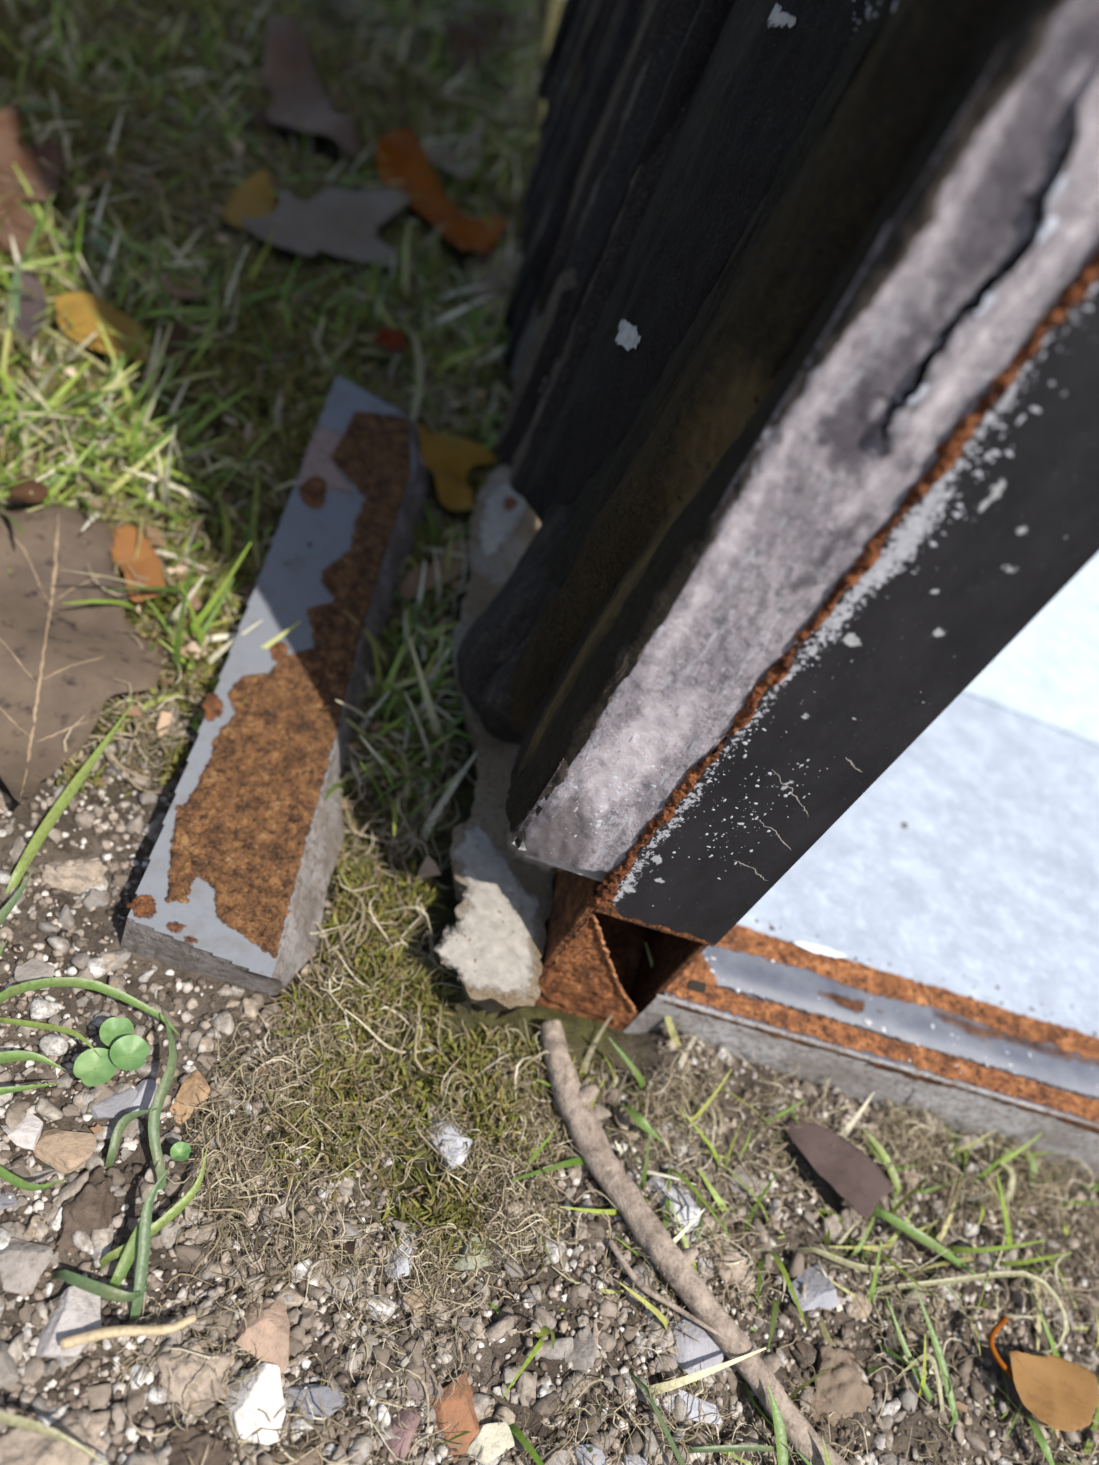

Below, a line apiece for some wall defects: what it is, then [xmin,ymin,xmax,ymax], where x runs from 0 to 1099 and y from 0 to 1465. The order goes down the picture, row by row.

peeling [297,427,352,493]
water stain [522,17,1099,866]
crack [875,107,1078,459]
corrosion [586,250,1099,1134]
peeling [794,941,846,957]